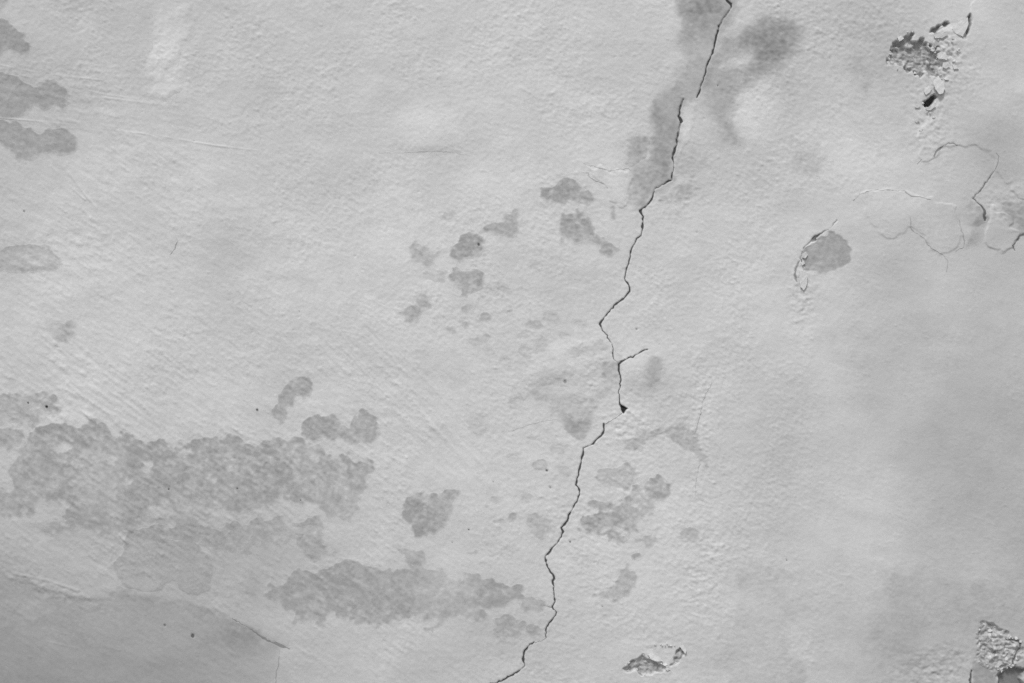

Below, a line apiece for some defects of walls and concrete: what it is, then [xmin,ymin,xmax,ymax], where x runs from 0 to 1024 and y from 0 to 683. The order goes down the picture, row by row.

spalling [886,13,973,131]
leakage [615,0,810,217]
crack [917,142,958,164]
peeling [793,223,854,290]
crack [853,152,999,272]
crack [1011,233,1024,251]
crack [491,0,732,683]
spalling [622,643,686,677]
spalling [969,621,1024,683]